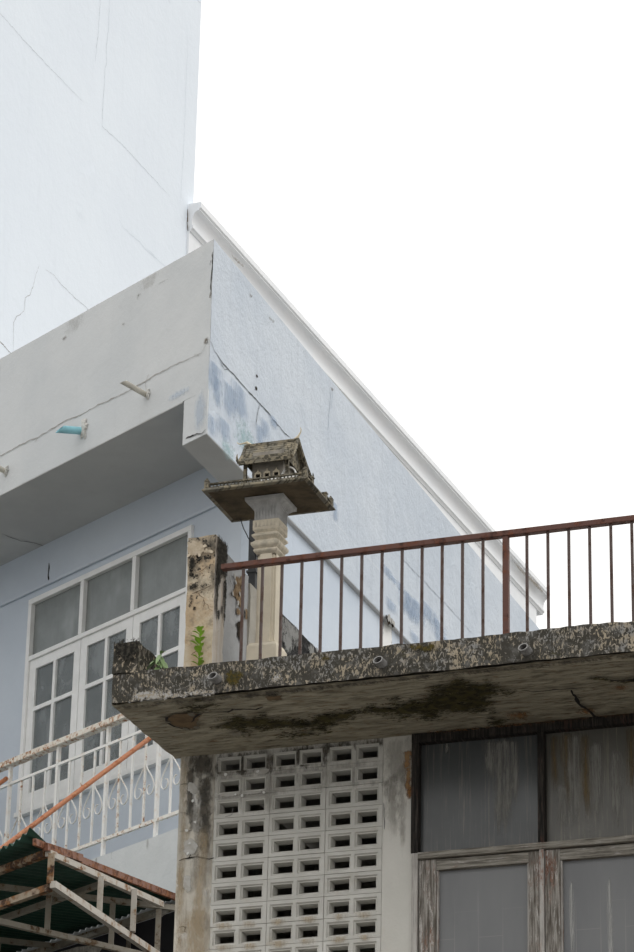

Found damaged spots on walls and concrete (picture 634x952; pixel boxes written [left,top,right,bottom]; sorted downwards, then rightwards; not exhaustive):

crack [8,0,188,230]
crack [1,270,87,352]
crack [0,345,288,456]
mould [188,536,228,621]
water stain [122,666,431,709]
crack [524,688,598,718]